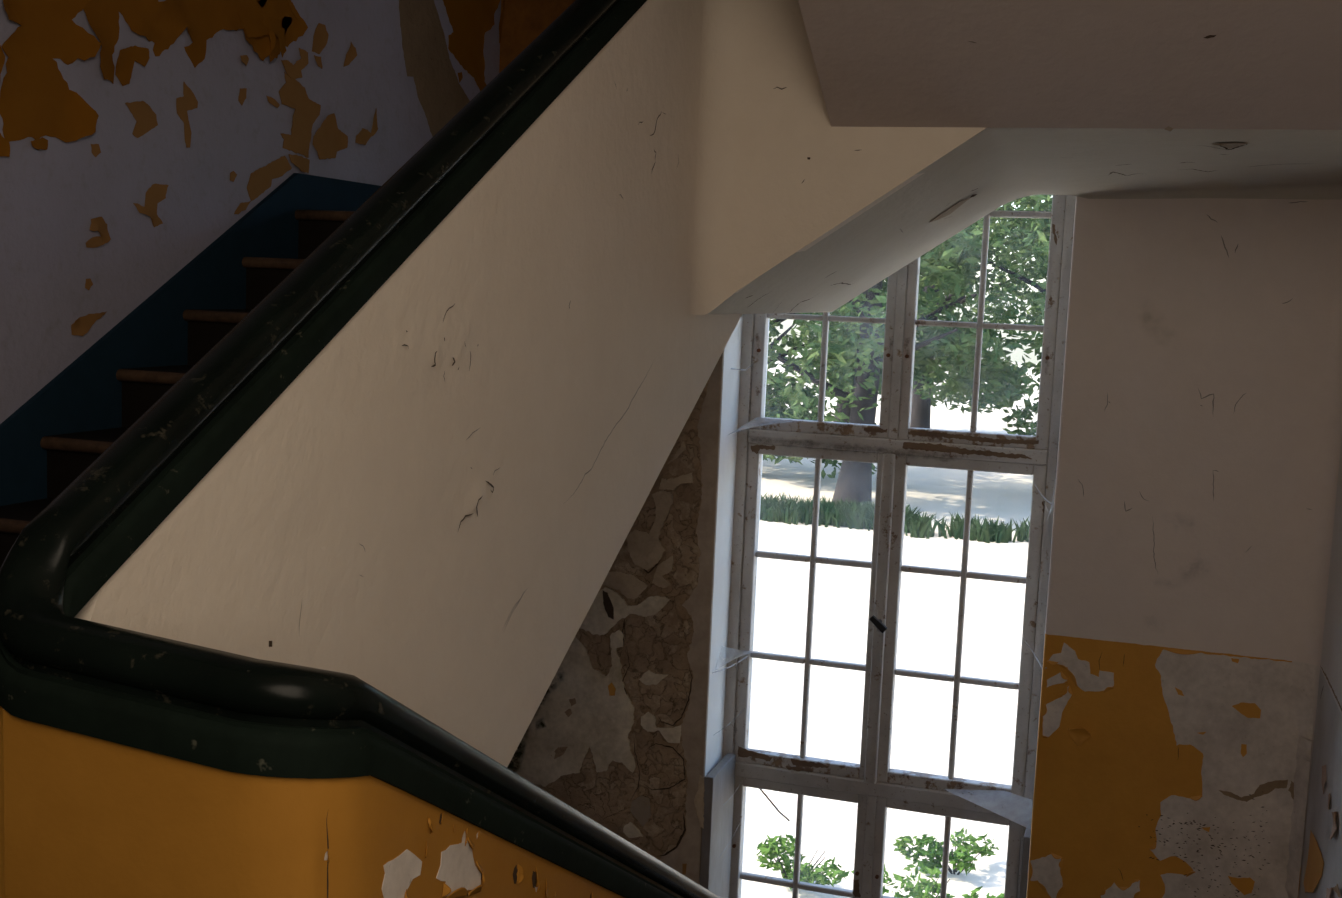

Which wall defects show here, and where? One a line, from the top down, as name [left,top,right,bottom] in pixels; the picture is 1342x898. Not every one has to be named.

peeling [0,0,378,214]
spalling [399,0,505,137]
peeling [86,217,111,248]
peeling [133,184,169,227]
peeling [71,312,106,336]
spalling [535,376,711,874]
peeling [1041,643,1114,739]
peeling [1150,648,1341,898]
peeling [381,812,485,898]
peeling [1029,853,1065,898]
peeling [1100,879,1141,898]